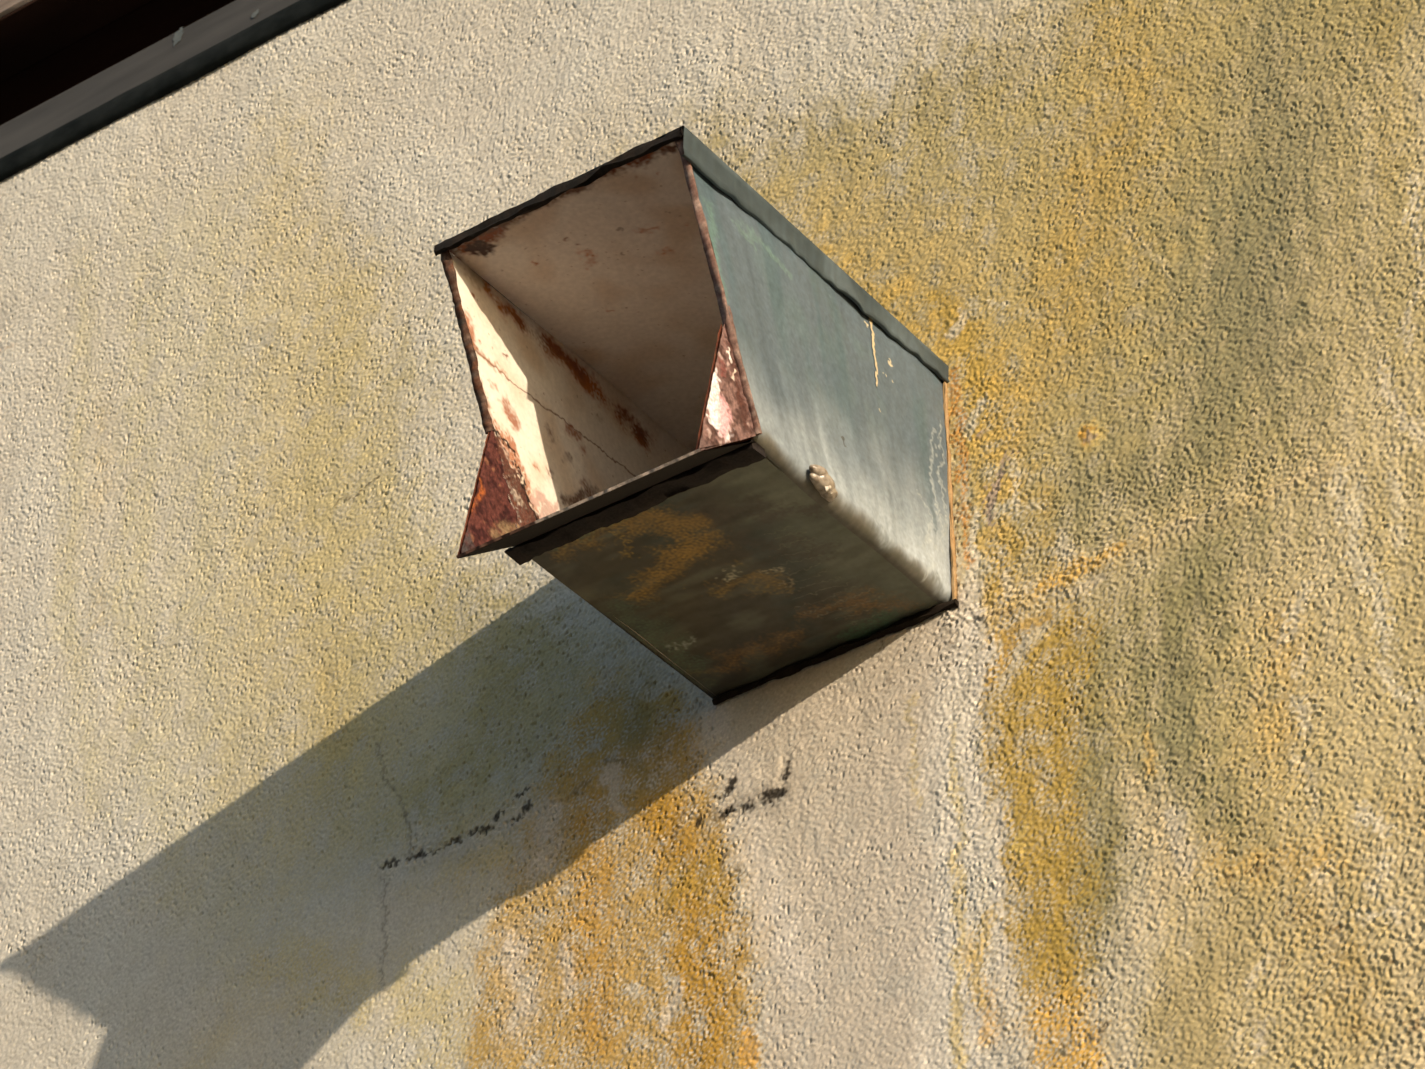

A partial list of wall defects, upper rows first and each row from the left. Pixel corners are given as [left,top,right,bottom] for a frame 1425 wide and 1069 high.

rust [947,362,977,567]
leakage [892,0,1425,1069]